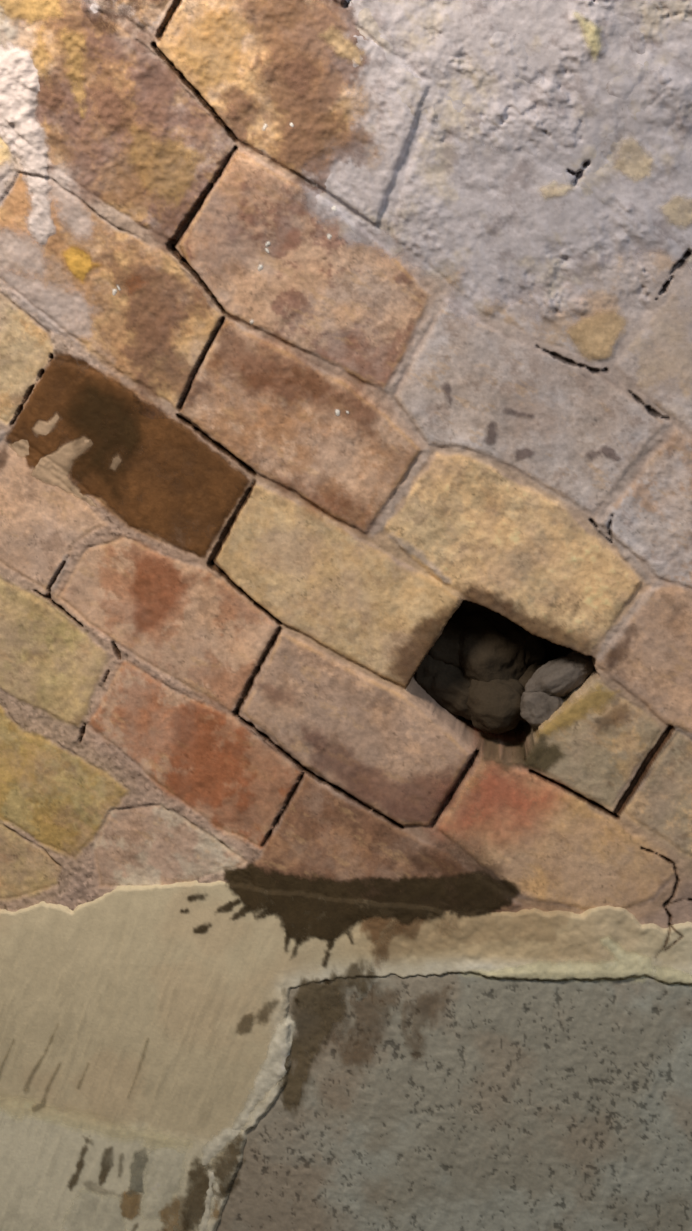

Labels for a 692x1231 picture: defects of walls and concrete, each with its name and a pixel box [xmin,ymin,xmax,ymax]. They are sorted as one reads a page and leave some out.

leakage [83,0,139,30]
leakage [0,0,124,337]
leakage [245,0,692,320]
leakage [6,262,248,557]
spalling [414,600,595,734]
leakage [217,863,519,984]
crack [641,847,692,950]